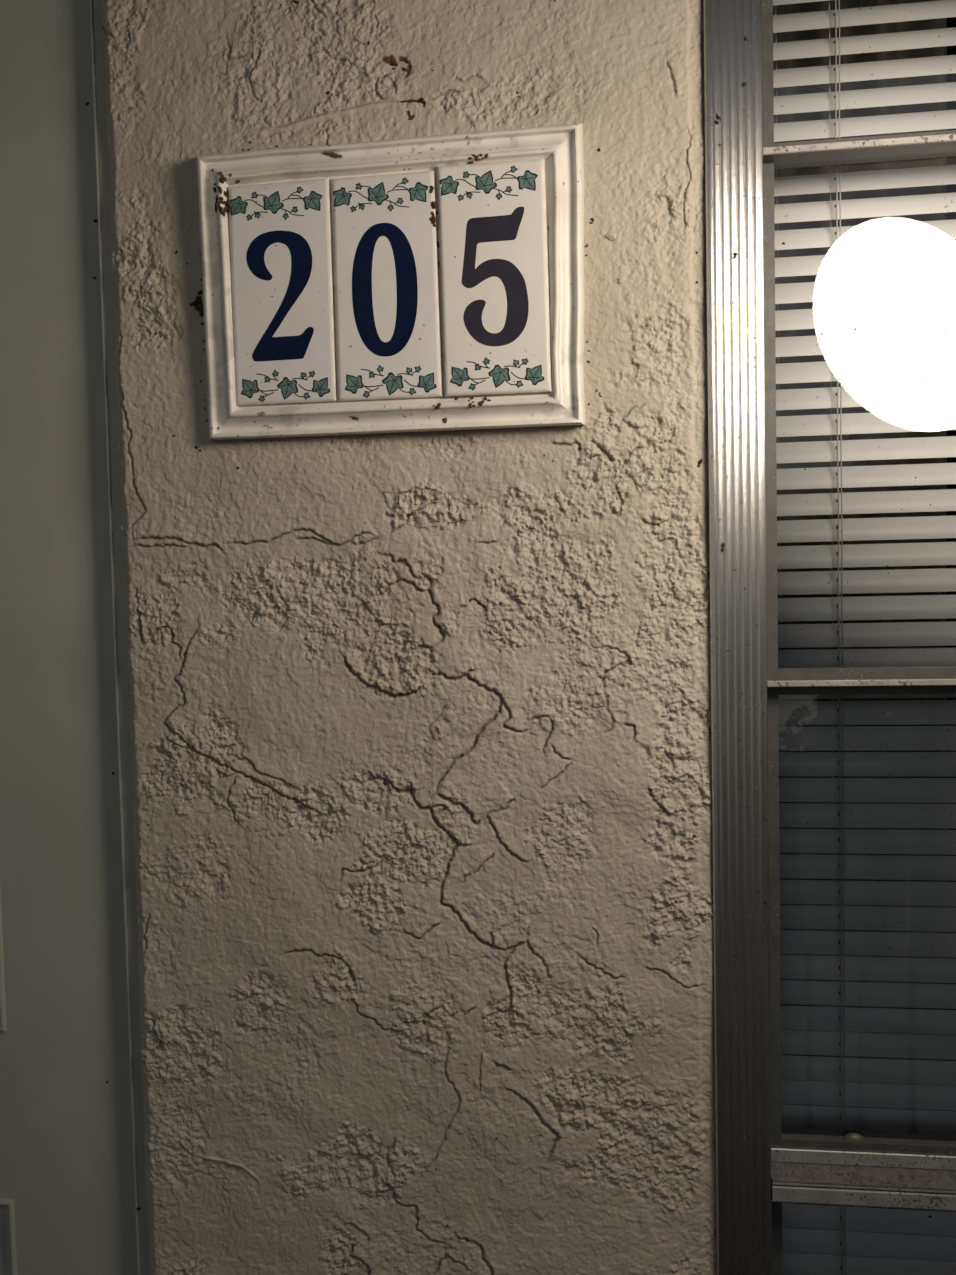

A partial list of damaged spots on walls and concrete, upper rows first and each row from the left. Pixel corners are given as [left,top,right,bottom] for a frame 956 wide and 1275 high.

rust [383,55,413,78]
rust [401,97,426,120]
crack [552,404,671,526]
crack [602,646,636,740]
crack [118,325,572,1275]
crack [648,787,670,817]
crack [578,927,704,988]